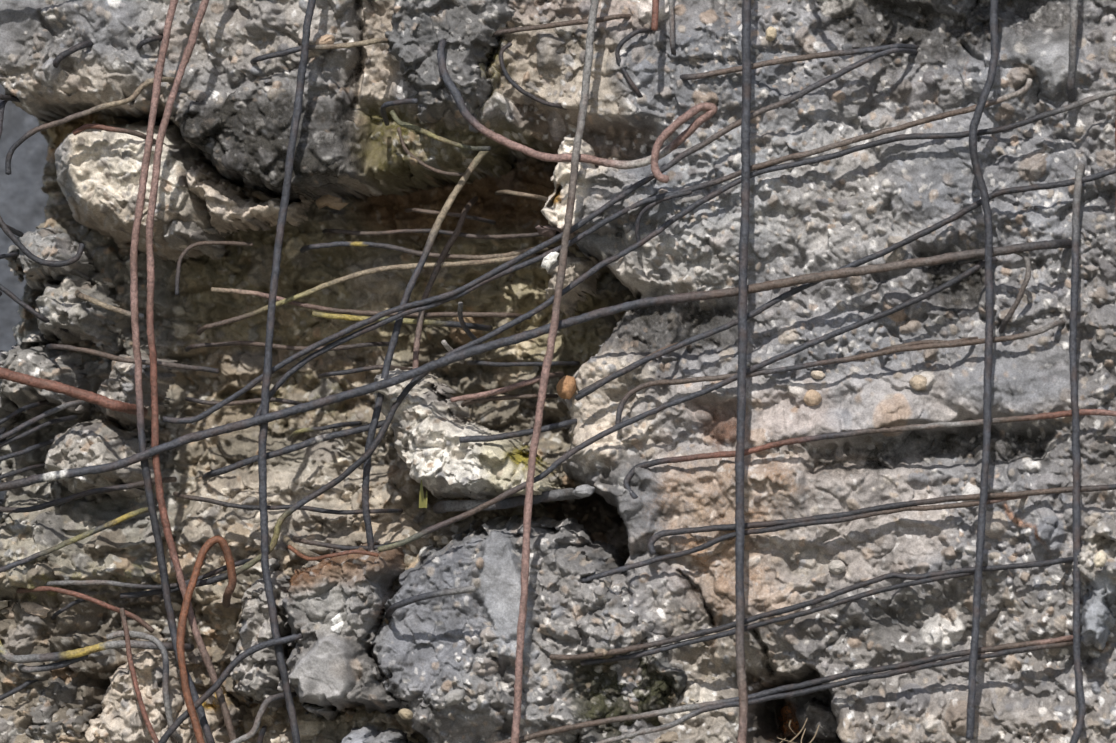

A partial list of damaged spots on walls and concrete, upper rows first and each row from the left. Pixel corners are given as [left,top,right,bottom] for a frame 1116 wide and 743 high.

spalling [0,0,572,743]
crack [333,0,373,121]
spalling [272,0,1086,743]